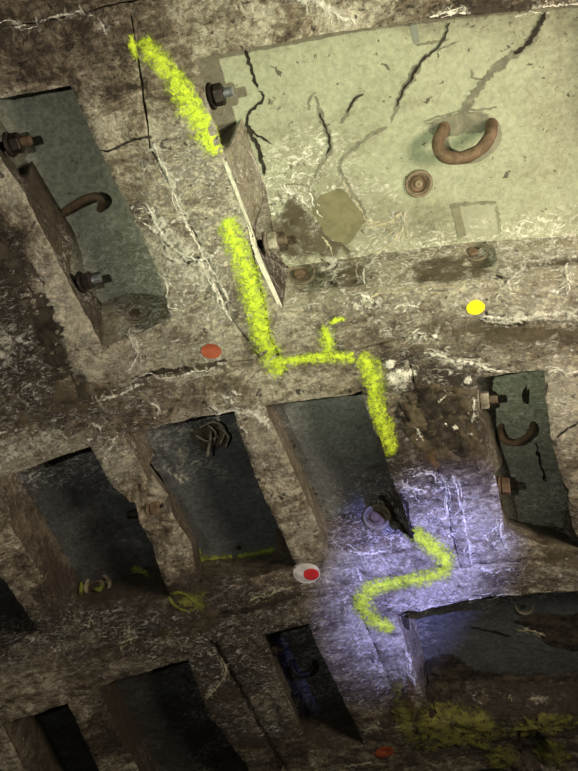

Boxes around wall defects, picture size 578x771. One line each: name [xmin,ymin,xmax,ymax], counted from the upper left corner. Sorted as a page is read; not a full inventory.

crack [101,136,152,153]
crack [245,50,271,175]
damp [299,0,357,27]
crack [285,23,457,215]
damp [430,7,469,18]
crack [458,12,549,116]
damp [139,143,232,321]
damp [0,233,226,470]
crack [535,443,570,504]
spalling [514,613,578,651]